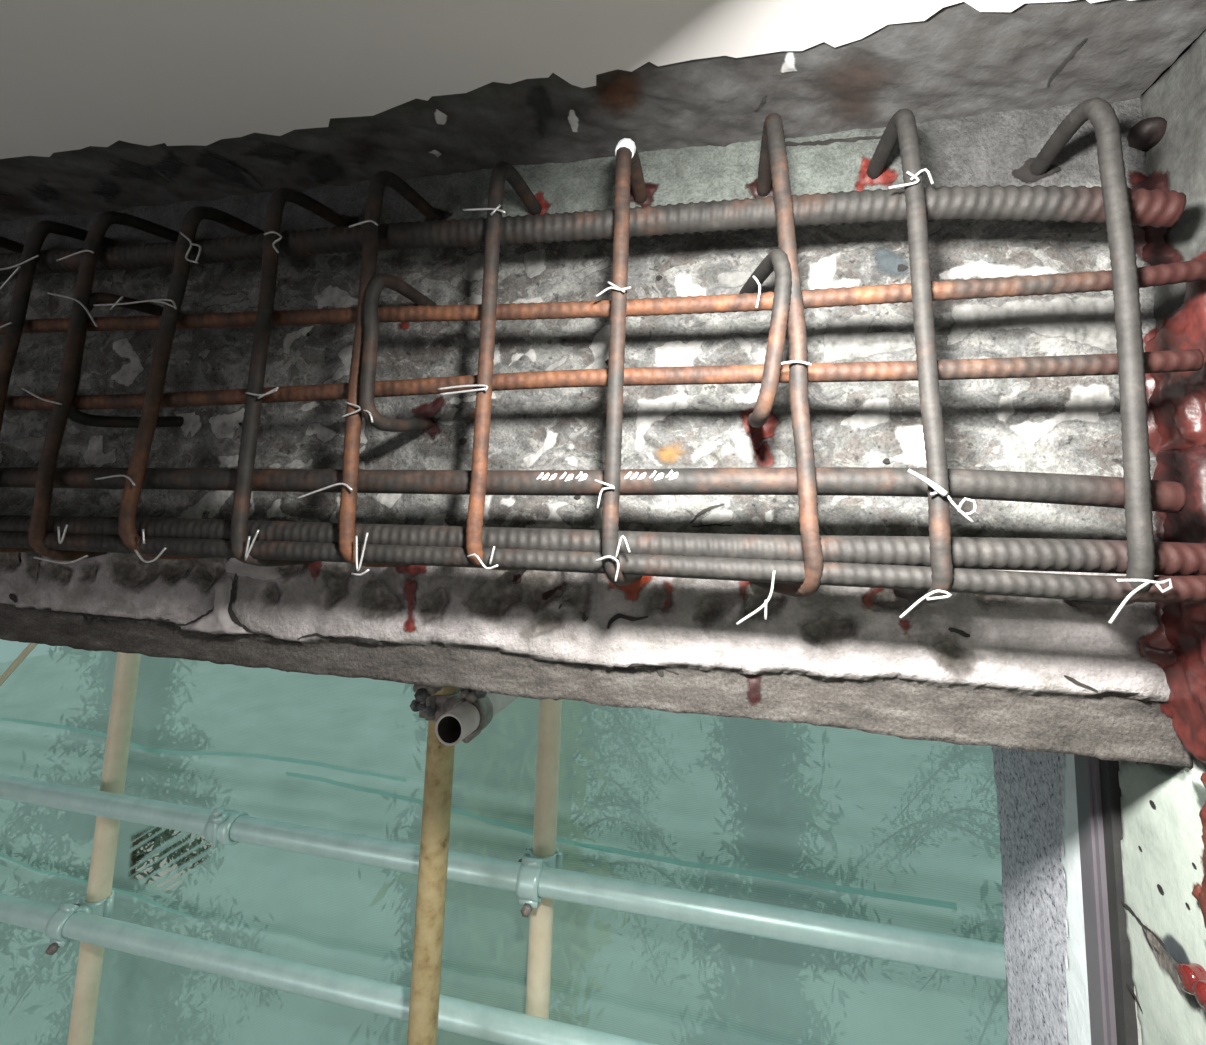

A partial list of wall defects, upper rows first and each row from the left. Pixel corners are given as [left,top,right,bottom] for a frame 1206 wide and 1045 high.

peeling [0,0,1206,223]
peeling [691,435,757,463]
peeling [883,425,927,468]
peeling [482,495,515,527]
spalling [0,551,306,604]
crack [9,573,384,645]
spalling [360,578,403,618]
spalling [464,570,591,636]
spalling [693,583,785,628]
spalling [801,611,856,647]
crack [579,663,679,676]
spalling [930,635,975,673]